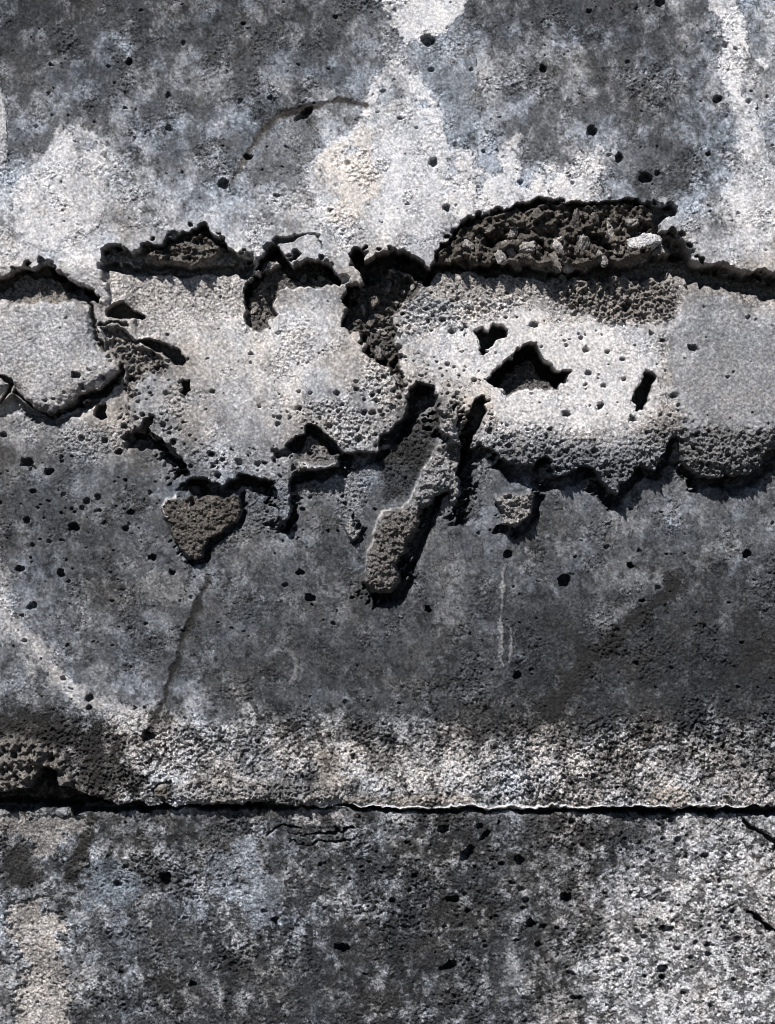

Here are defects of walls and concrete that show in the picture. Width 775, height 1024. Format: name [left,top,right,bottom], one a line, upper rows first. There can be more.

spalling [0,195,775,425]
flaking render [160,471,275,561]
crack [0,794,775,851]